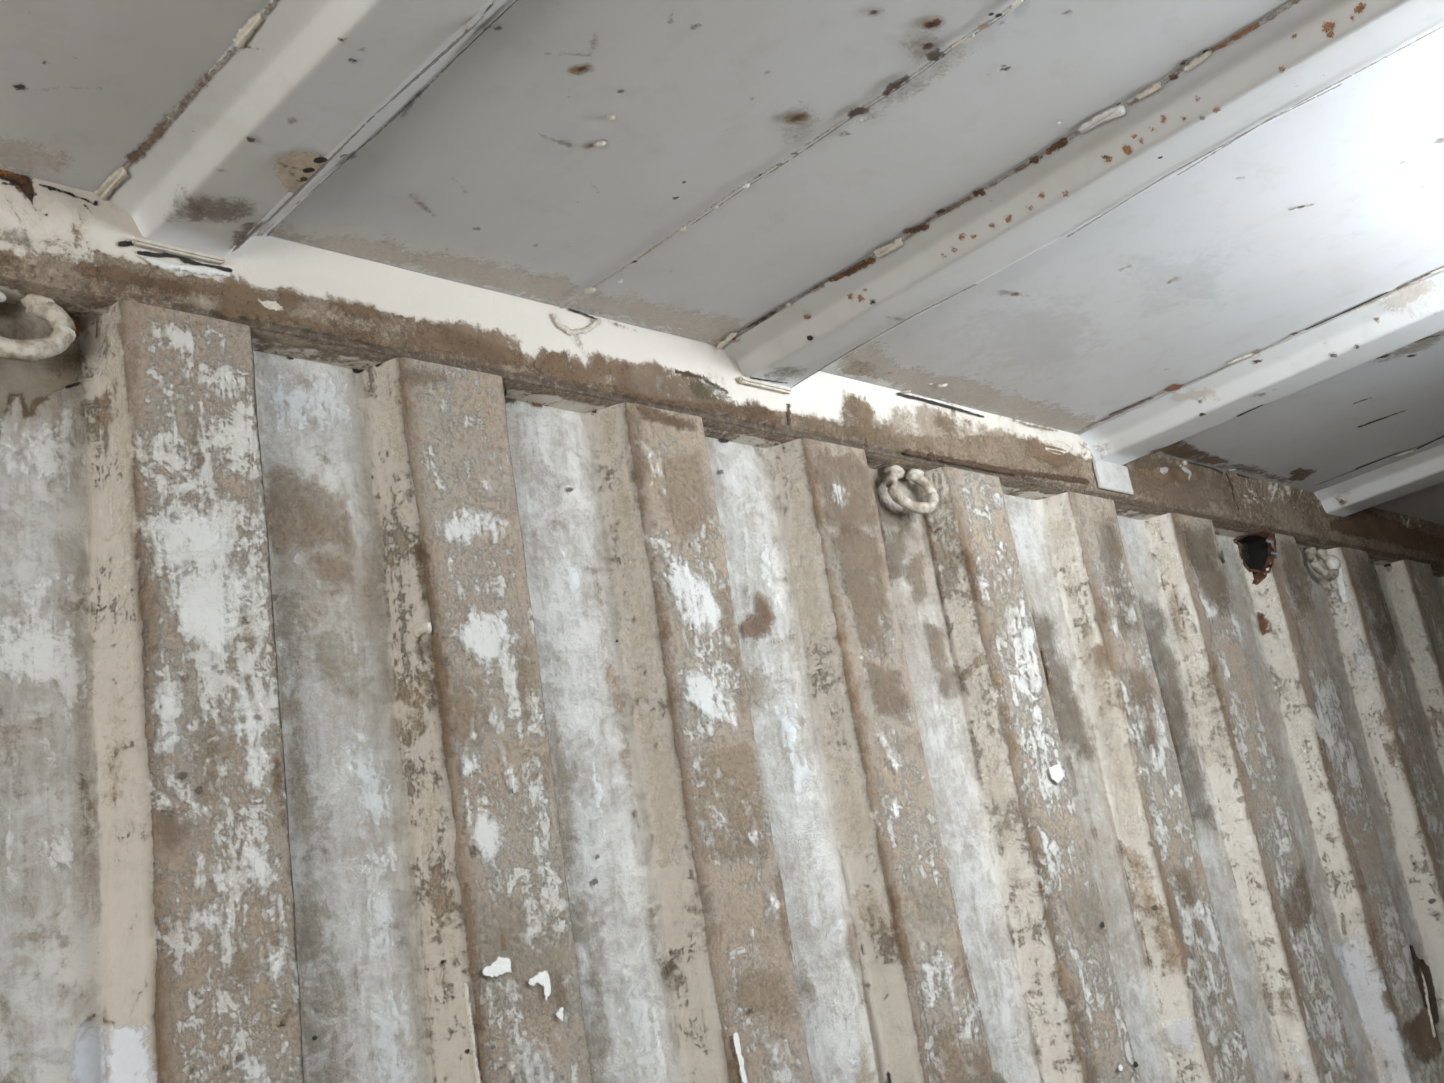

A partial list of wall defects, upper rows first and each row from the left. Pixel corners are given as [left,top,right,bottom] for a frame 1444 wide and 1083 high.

corrosion [922,18,945,61]
corrosion [0,169,37,200]
corrosion [903,188,985,234]
corrosion [801,257,876,297]
leakage [0,343,82,427]
leakage [750,284,976,388]
peeling [105,512,263,654]
spalling [1224,535,1296,691]
peeling [464,883,512,1031]
peeling [529,970,564,1022]
peeling [1332,933,1415,1083]
corrosion [1393,945,1442,1064]